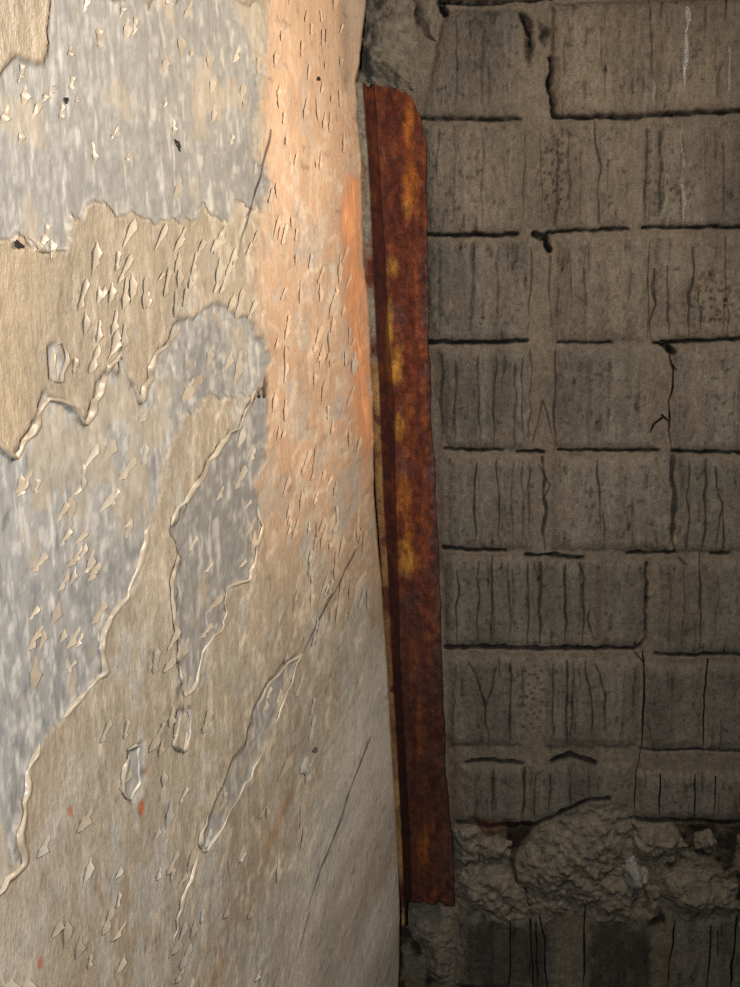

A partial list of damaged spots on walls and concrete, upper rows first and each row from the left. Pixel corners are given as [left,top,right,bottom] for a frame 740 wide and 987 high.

peeling [301,0,347,153]
peeling [295,245,359,434]
corrosion [342,179,371,446]
peeling [0,0,292,896]
crack [650,344,677,450]
peeling [50,917,93,969]
peeling [102,892,126,941]
spalling [507,821,534,882]
spalling [622,855,649,894]
spalling [666,819,740,911]